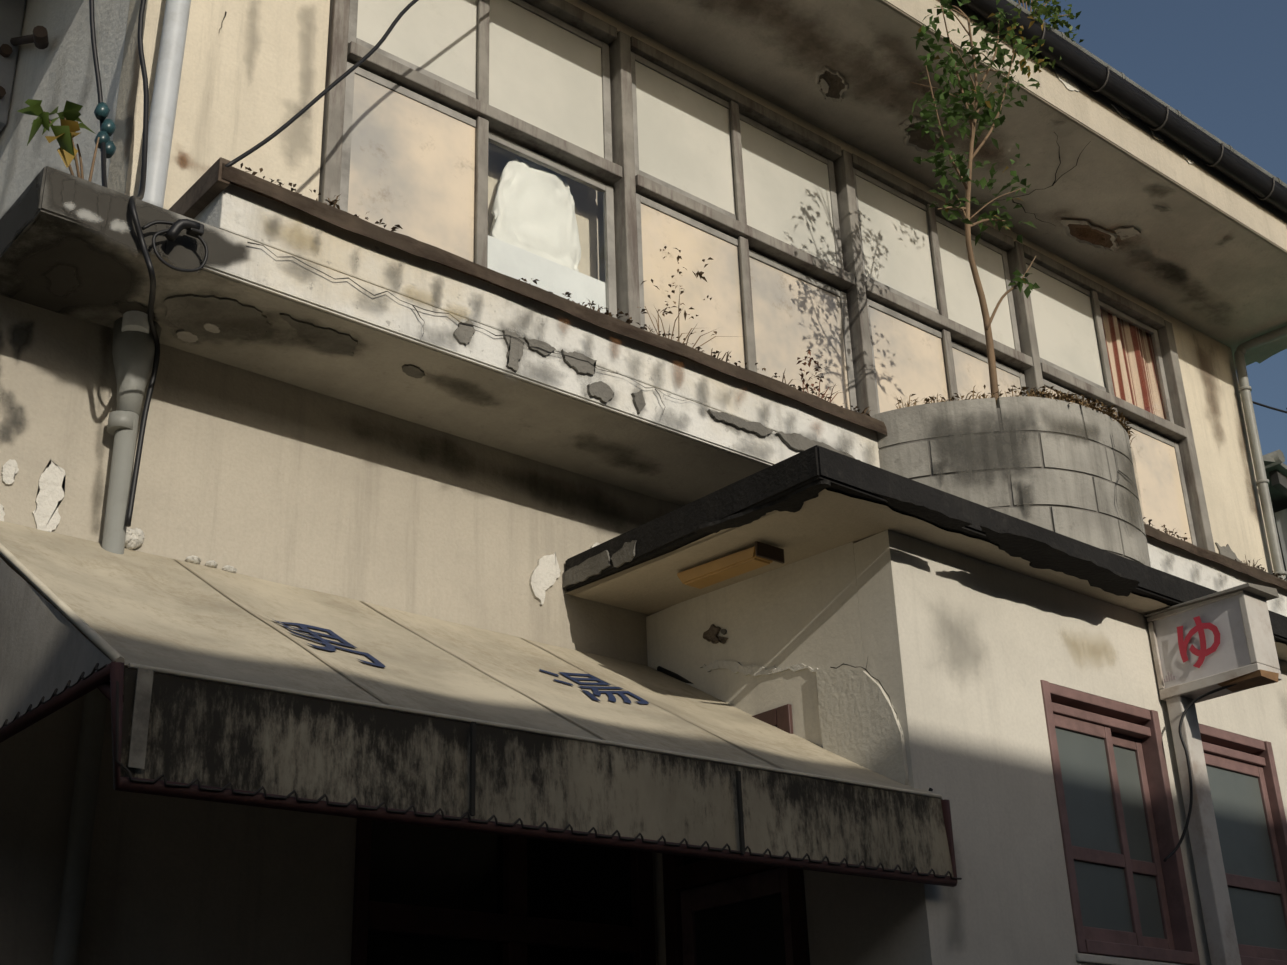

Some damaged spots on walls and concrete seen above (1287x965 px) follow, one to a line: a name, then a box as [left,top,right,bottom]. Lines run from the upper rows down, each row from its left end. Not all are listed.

spalling [815,66,849,103]
leakage [5,169,248,321]
leakage [0,323,33,359]
peeling [453,319,476,345]
peeling [502,329,614,403]
leakage [0,396,23,441]
peeling [631,390,646,414]
peeling [1,459,19,485]
peeling [32,459,66,532]
leakage [933,416,1035,514]
peeling [529,540,637,605]
crack [830,659,903,736]